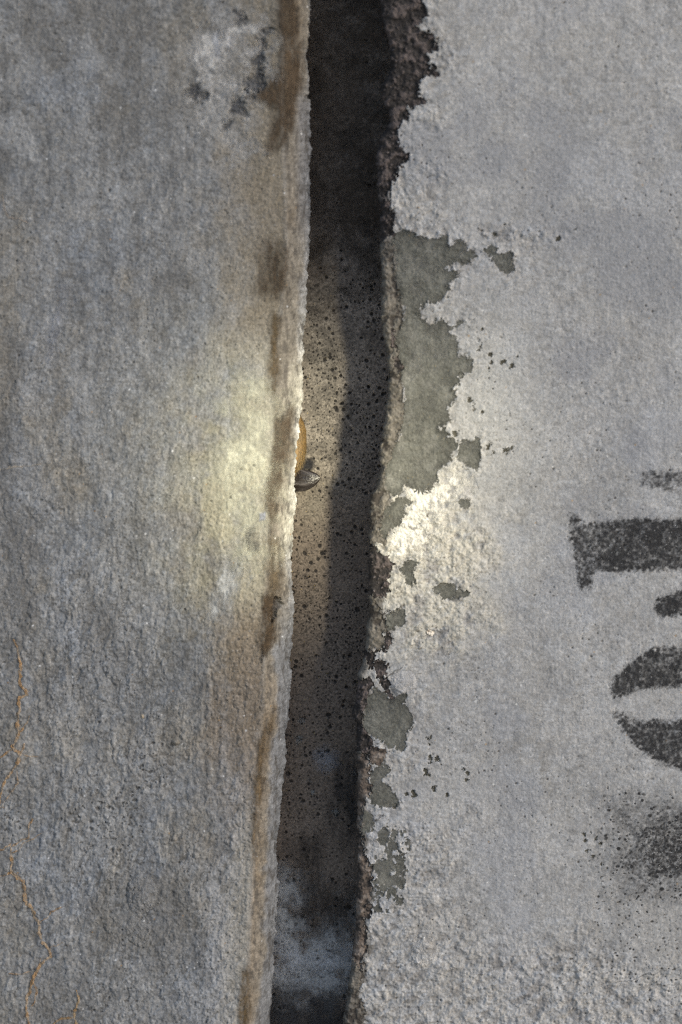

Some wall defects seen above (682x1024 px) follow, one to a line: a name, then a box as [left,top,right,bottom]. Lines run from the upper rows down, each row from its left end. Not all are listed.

rust [258,0,301,149]
rust [260,247,287,293]
rust [270,315,280,390]
rust [265,408,293,521]
peeling [343,0,516,1024]
rust [261,541,279,654]
crack [0,639,30,801]
rust [253,723,272,844]
crack [0,818,79,1024]
rust [239,972,249,1024]